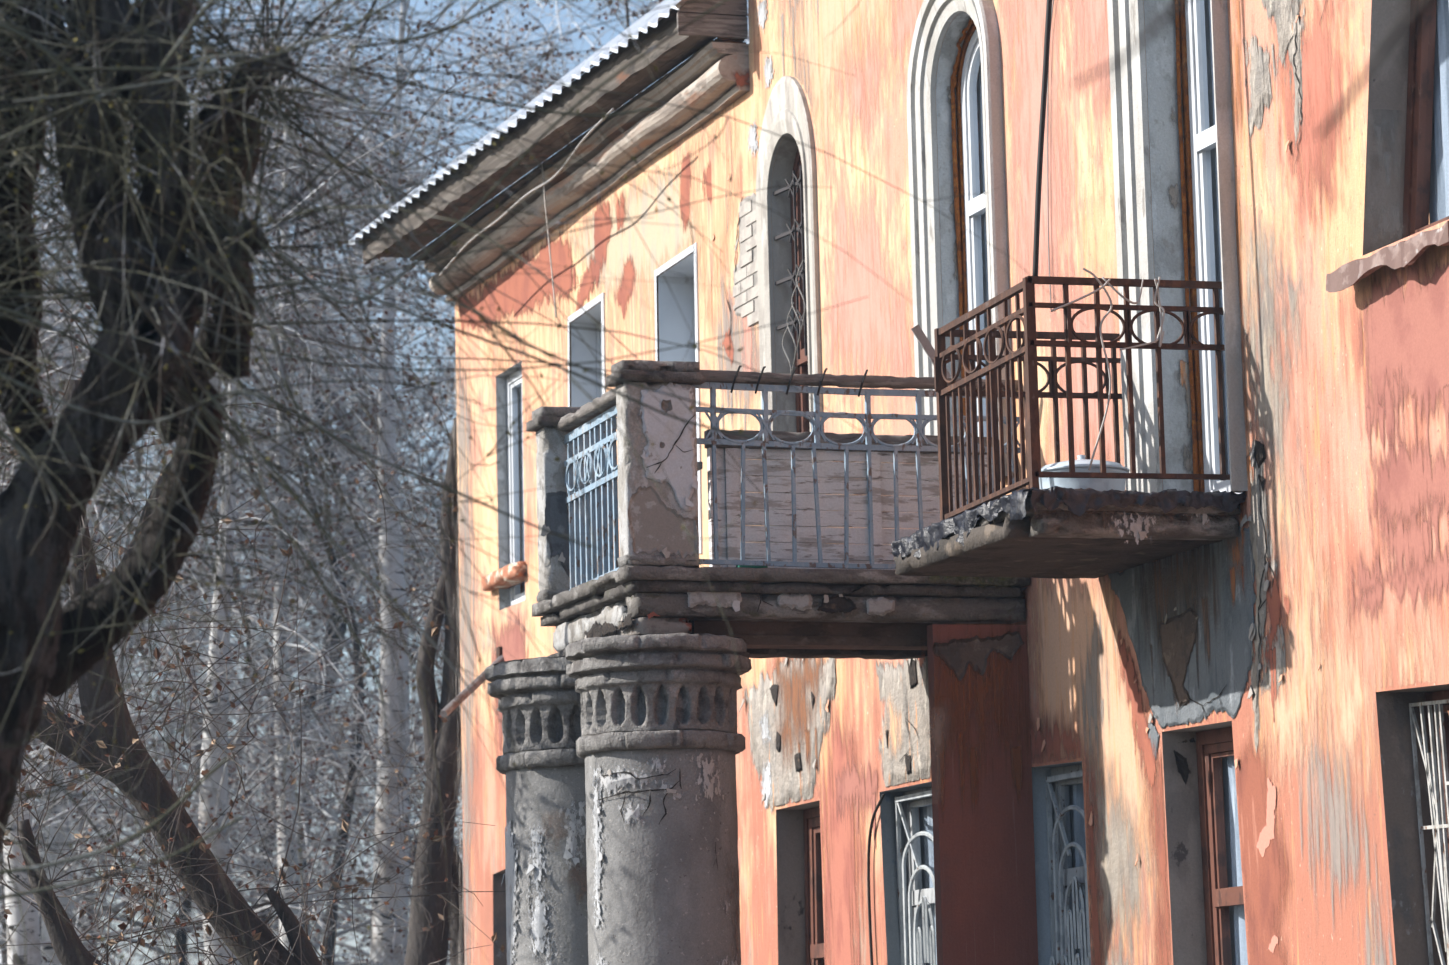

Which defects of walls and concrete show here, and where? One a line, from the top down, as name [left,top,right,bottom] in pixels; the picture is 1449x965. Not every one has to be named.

peeling [1242,0,1343,220]
peeling [628,382,699,559]
peeling [1240,221,1370,786]
damp [1350,261,1449,617]
peeling [501,753,727,965]
flaking render [739,658,836,814]
peeling [876,577,1159,965]
damp [1141,545,1216,686]
flaking render [1160,606,1199,707]
flaking render [1174,738,1195,785]
peeling [1256,778,1276,857]
peeling [1267,935,1278,953]